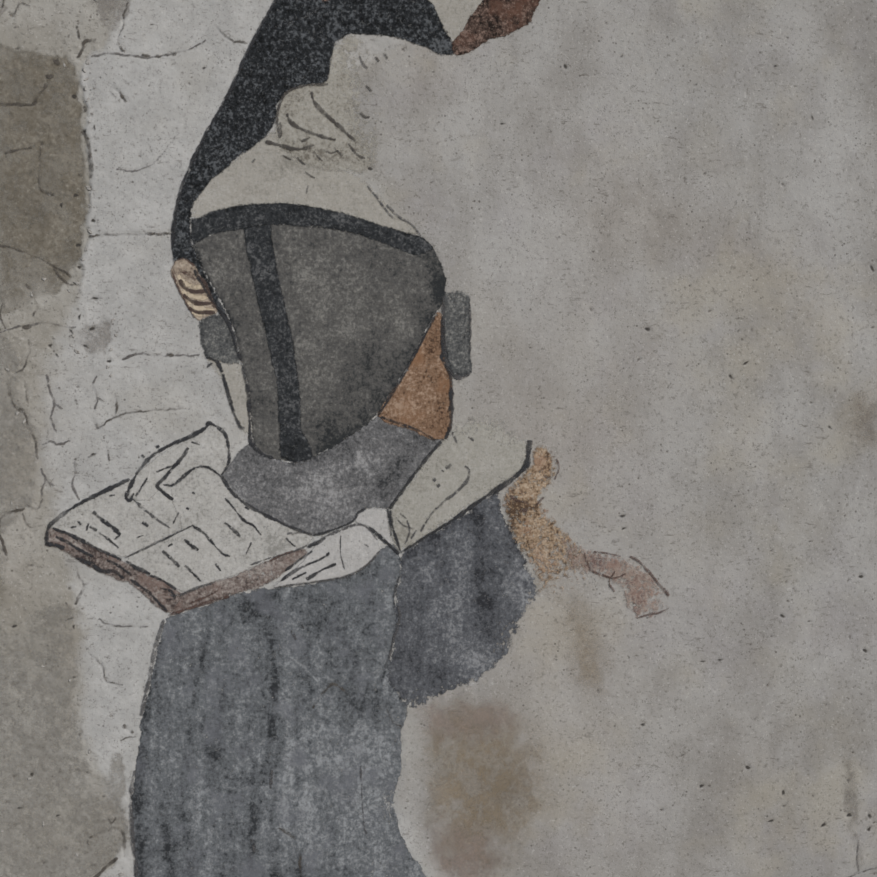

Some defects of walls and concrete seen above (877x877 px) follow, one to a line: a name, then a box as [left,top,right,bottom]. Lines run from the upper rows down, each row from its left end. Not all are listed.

crack [7,26,206,107]
crack [83,101,93,168]
spalling [0,47,100,298]
crack [47,262,74,285]
crack [0,312,74,331]
spalling [69,318,117,377]
crack [122,352,200,360]
crack [93,376,161,429]
crack [12,374,80,500]
crack [0,508,29,556]